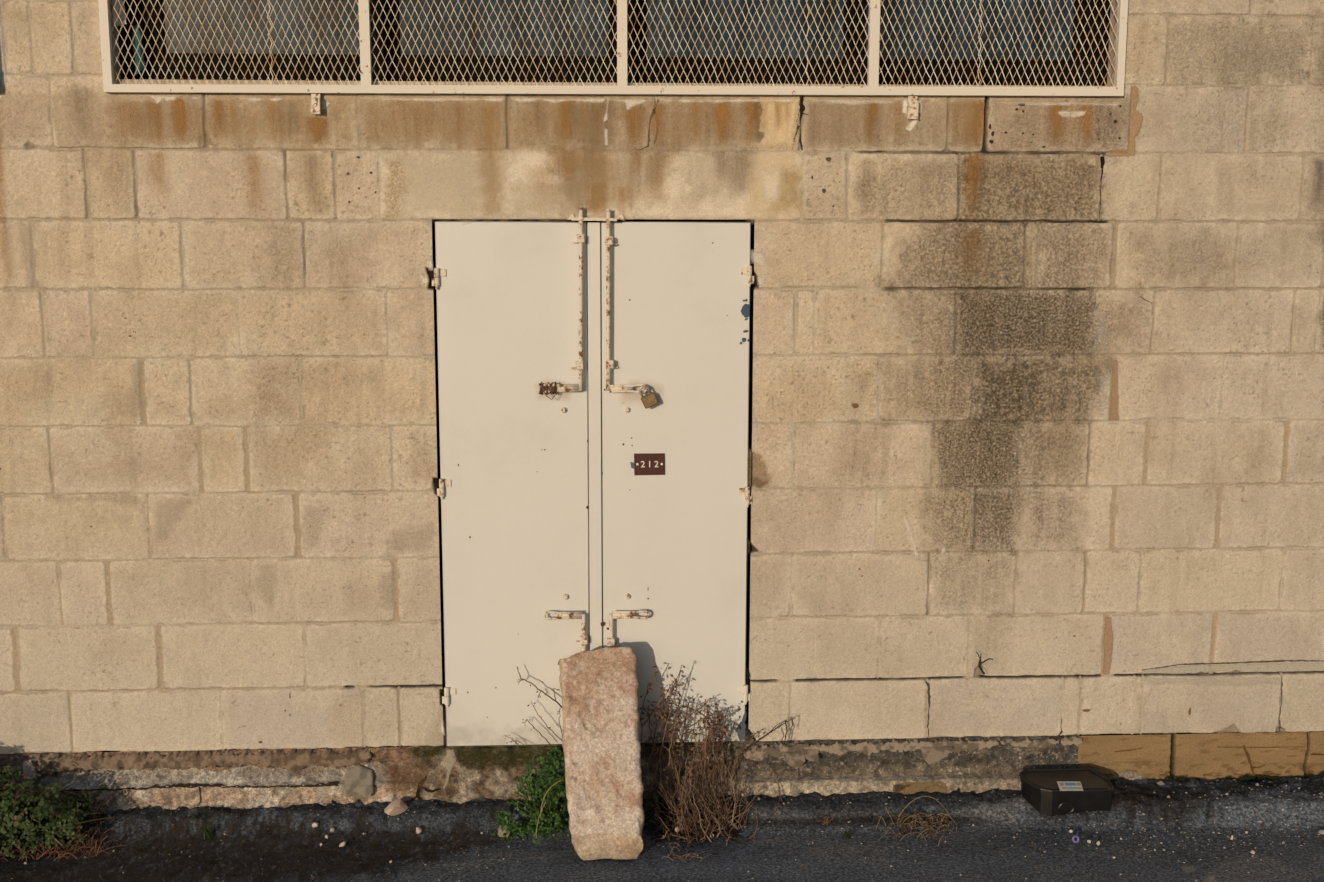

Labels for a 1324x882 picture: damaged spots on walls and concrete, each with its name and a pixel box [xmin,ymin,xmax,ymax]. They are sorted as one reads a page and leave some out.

water stain [940,295,1108,482]
crack [976,652,994,678]
flaking render [22,741,372,780]
spalling [893,782,947,794]